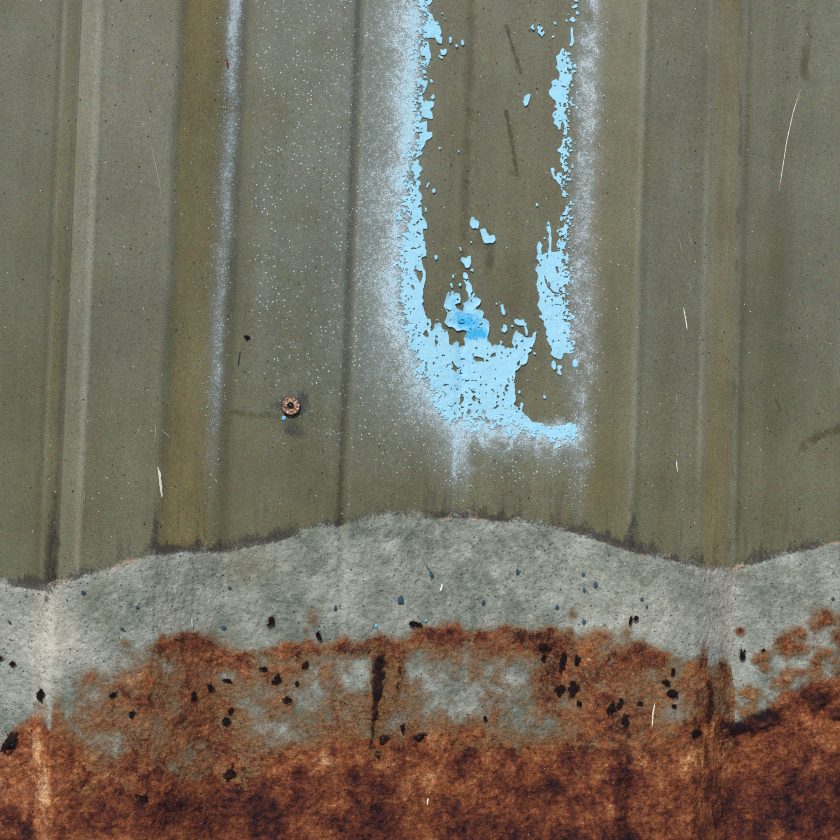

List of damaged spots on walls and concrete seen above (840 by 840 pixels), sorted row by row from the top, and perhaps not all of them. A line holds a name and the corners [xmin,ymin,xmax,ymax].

peeling [385,0,580,448]
peeling [259,666,283,685]
peeling [538,643,552,662]
peeling [554,681,582,708]
peeling [559,651,581,674]
peeling [660,668,678,708]
rust [0,605,840,840]
peeling [606,698,630,728]